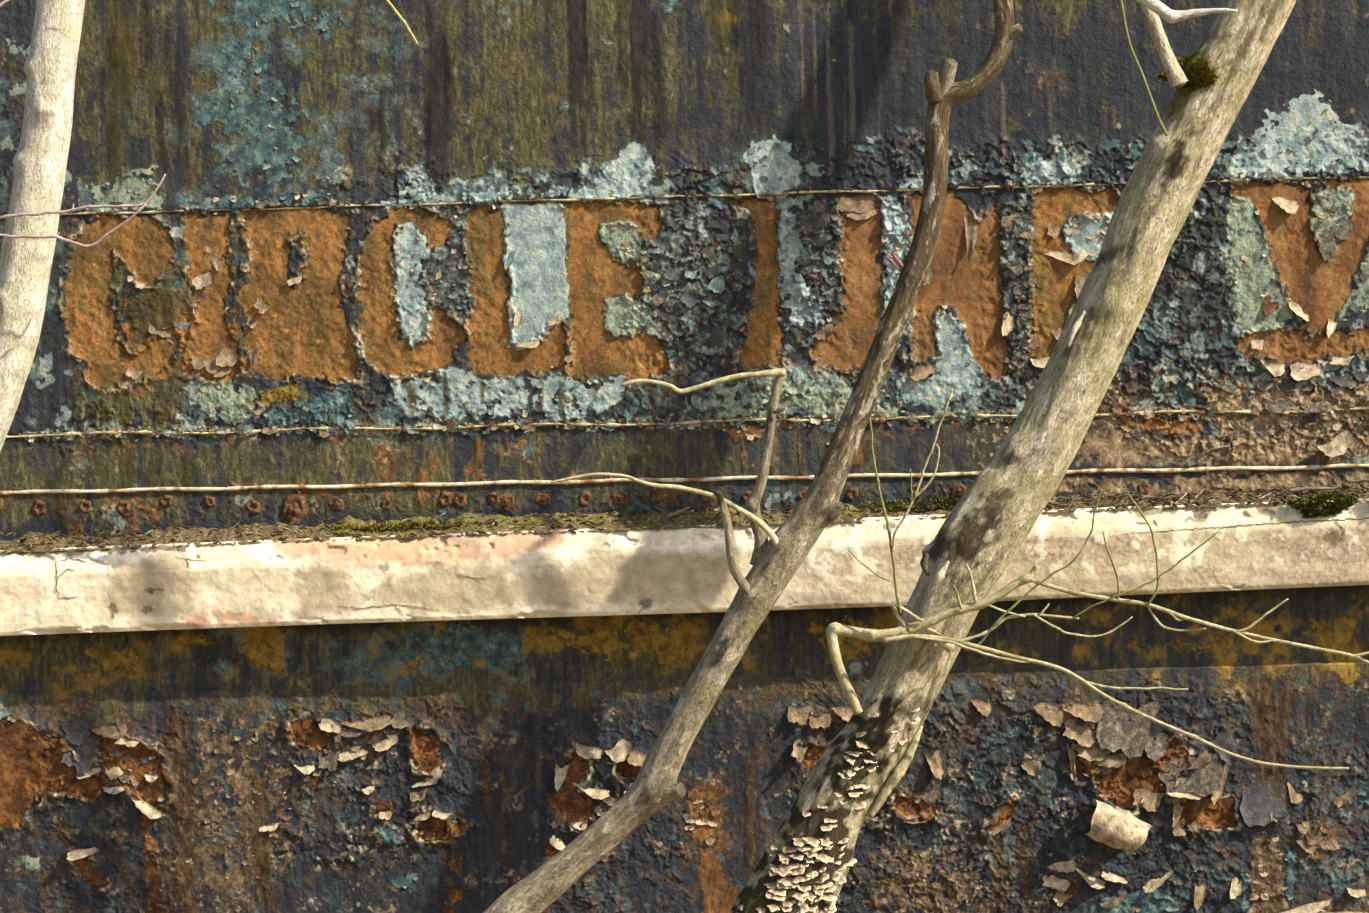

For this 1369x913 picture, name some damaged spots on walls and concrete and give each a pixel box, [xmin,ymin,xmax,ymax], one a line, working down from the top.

peeling [19,204,859,443]
peeling [380,142,656,352]
peeling [732,135,924,340]
peeling [867,142,1114,438]
peeling [1053,89,1369,513]
rust [11,497,186,557]
rust [418,465,428,508]
peeling [0,711,167,829]
peeling [175,712,452,913]
peeling [543,738,646,860]
peeling [787,705,854,779]
peeling [1033,700,1369,913]